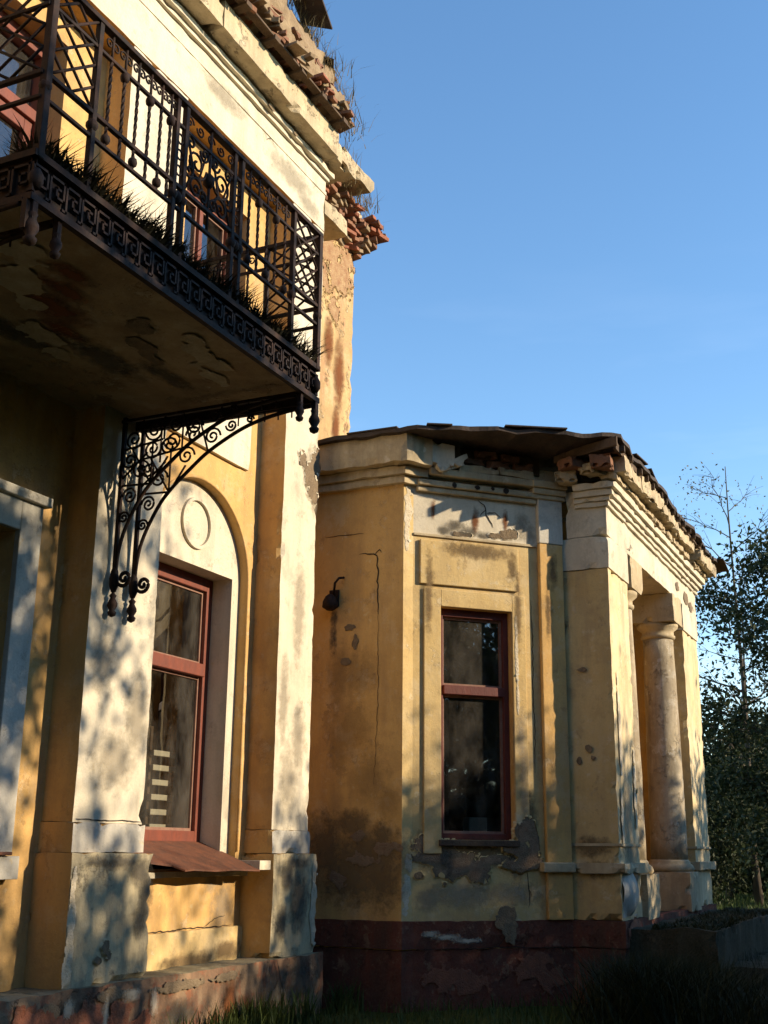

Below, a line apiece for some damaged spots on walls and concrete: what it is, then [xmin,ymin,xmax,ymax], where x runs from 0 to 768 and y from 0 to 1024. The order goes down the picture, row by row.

spalling [322,240,356,327]
peeling [297,444,321,506]
spalling [450,528,520,541]
spalling [340,624,359,666]
crack [327,533,381,776]
leakage [278,811,402,934]
spalling [401,815,544,917]
crack [149,915,229,934]